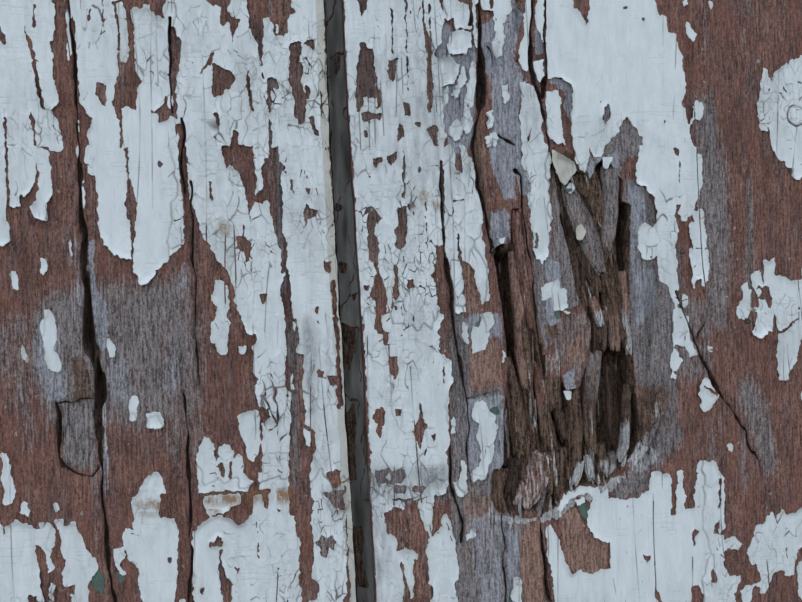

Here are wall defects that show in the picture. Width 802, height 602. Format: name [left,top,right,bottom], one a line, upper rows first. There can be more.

peeling [0,0,64,246]
peeling [9,271,19,290]
peeling [40,309,62,372]
crack [55,2,117,602]
peeling [65,0,512,602]
crack [439,162,487,543]
crack [513,169,531,260]
crack [532,284,546,375]
spalling [453,0,802,602]
crack [688,326,757,458]
peeling [0,452,104,602]